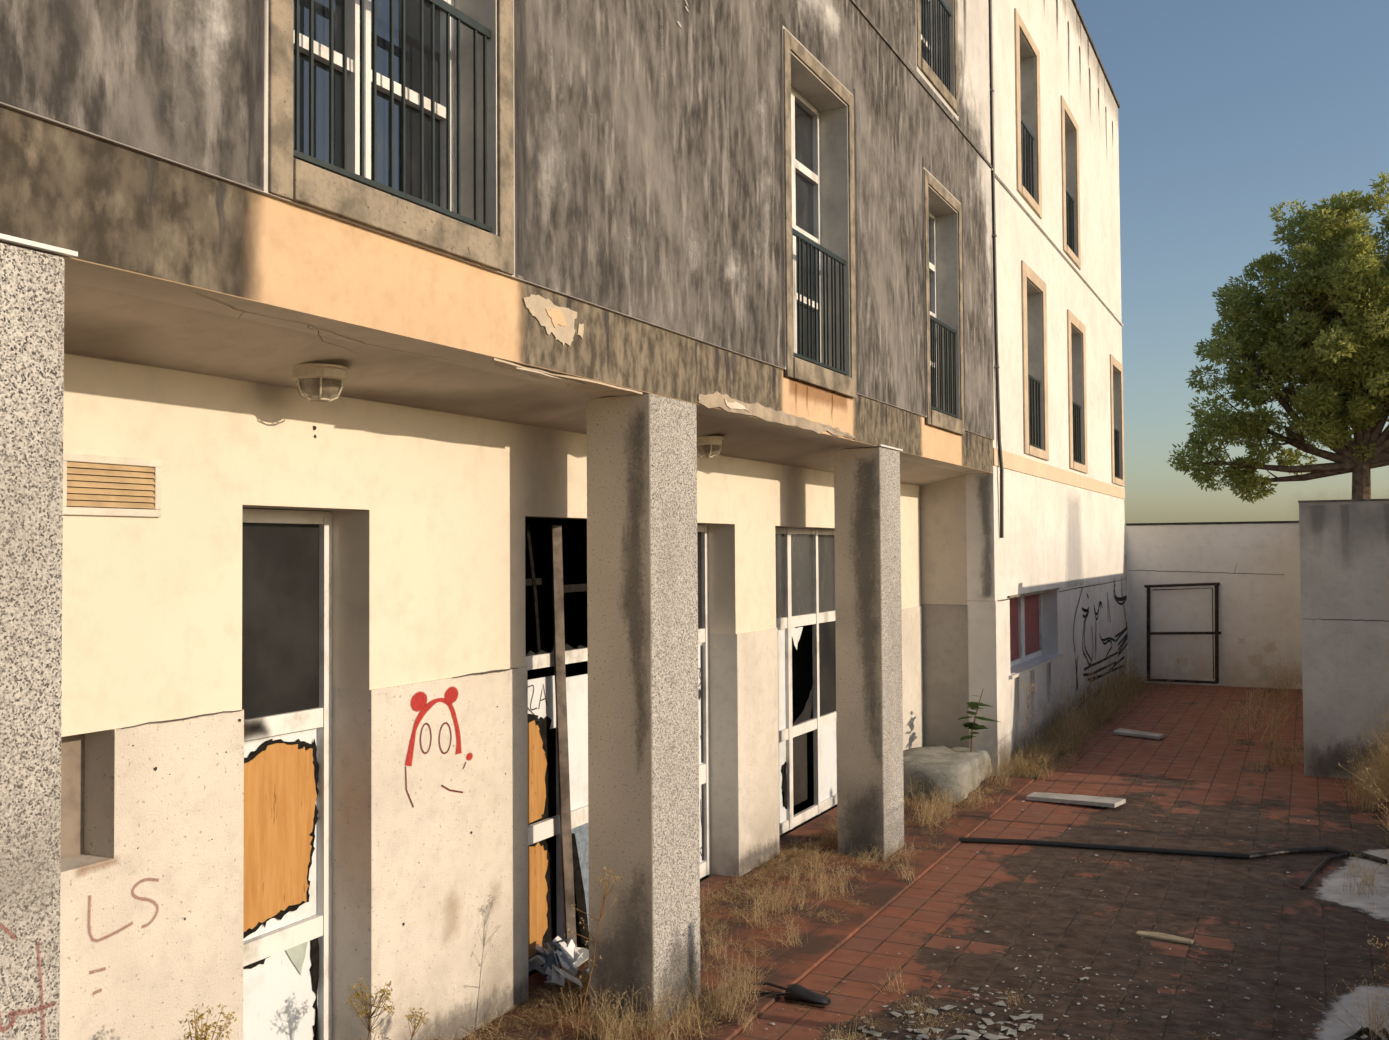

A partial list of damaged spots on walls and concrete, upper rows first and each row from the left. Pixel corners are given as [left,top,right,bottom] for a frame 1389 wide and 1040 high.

leakage [0,0,266,299]
peeling [523,294,584,346]
leakage [514,0,994,473]